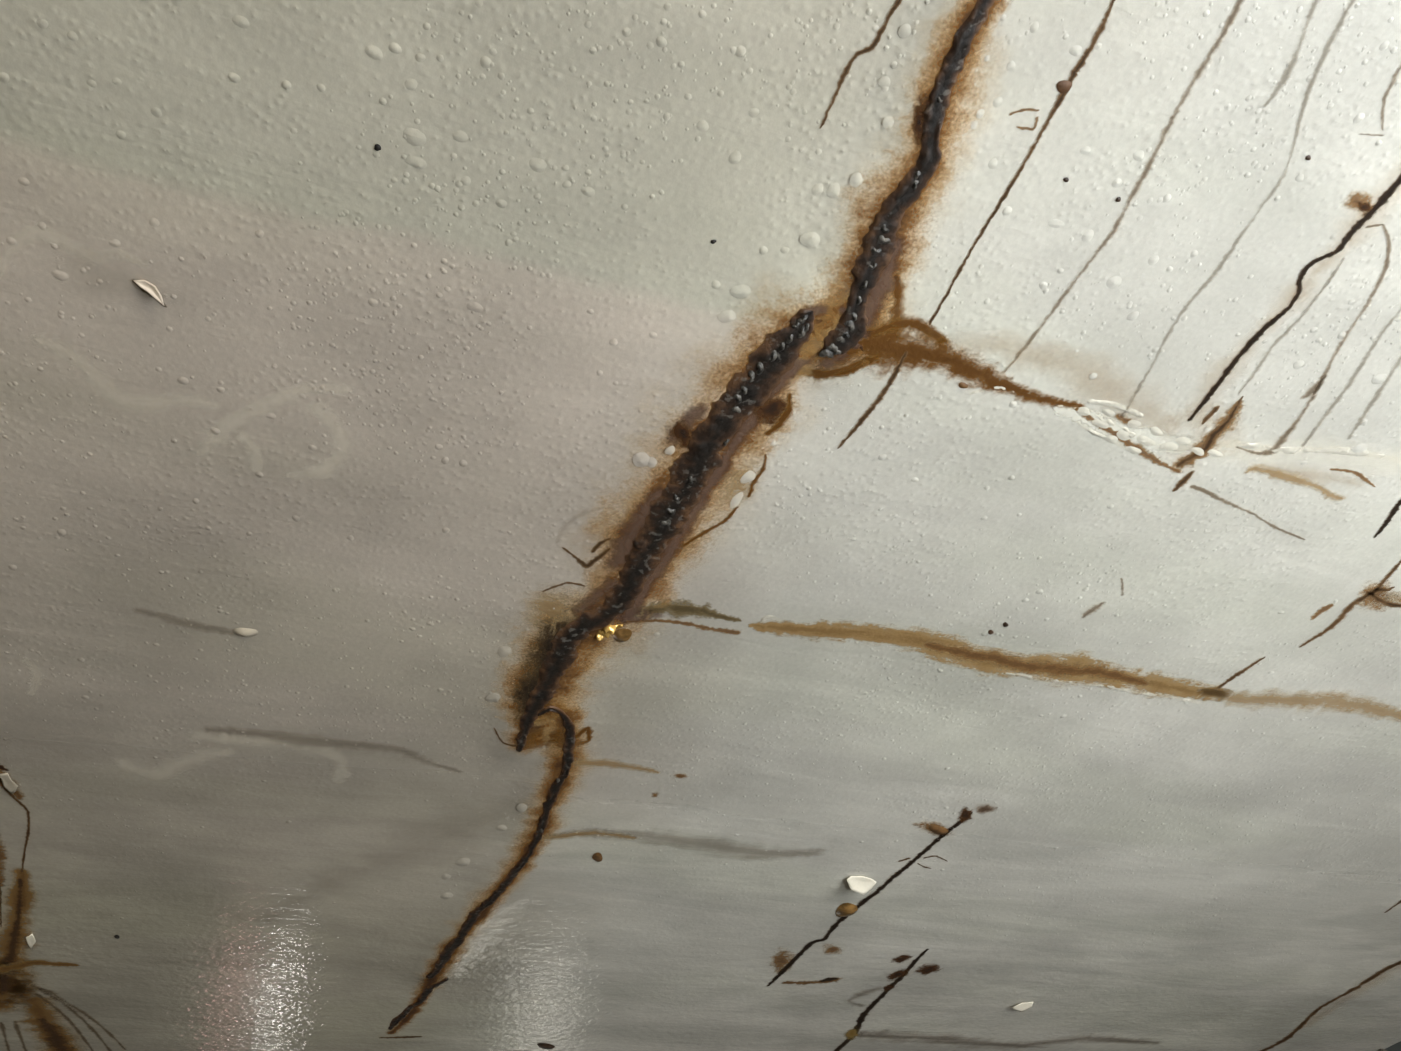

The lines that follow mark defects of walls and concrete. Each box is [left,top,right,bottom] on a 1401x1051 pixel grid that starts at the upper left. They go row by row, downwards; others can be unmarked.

crack [1361,67,1401,136]
crack [1172,175,1401,540]
peeling [1054,399,1401,473]
crack [380,0,1243,1051]
crack [1300,561,1401,647]
crack [1217,657,1265,689]
crack [0,765,30,927]
corrosion [0,869,126,1051]
crack [1261,961,1401,1051]